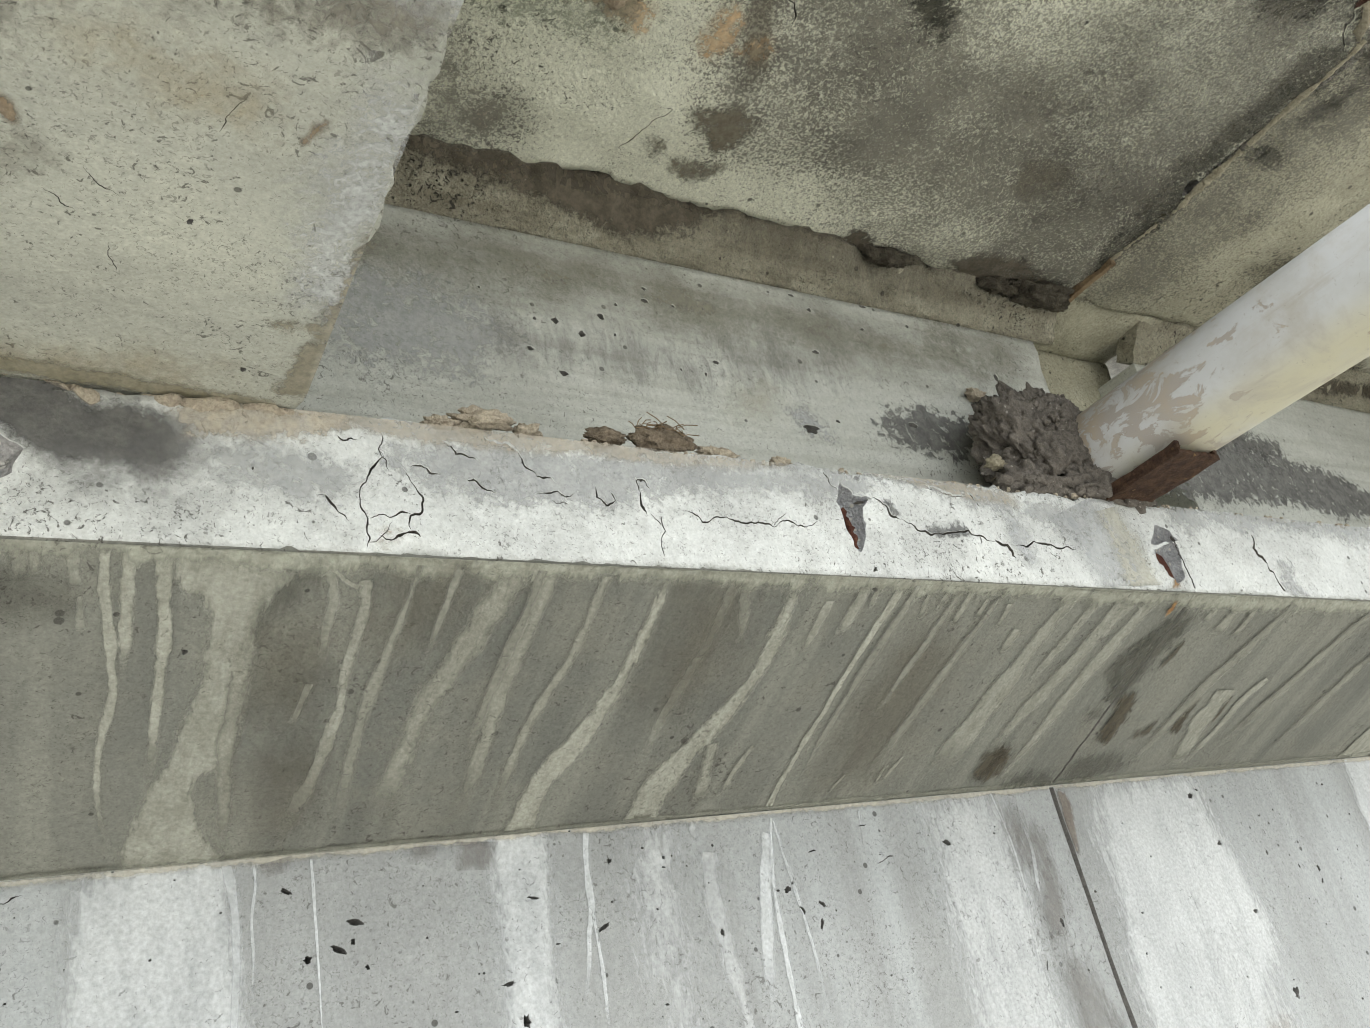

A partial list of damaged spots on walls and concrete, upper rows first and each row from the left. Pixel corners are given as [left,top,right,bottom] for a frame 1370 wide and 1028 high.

peeling [1352,0,1370,42]
leakage [648,0,1370,322]
leakage [0,0,551,476]
leakage [468,246,741,323]
spalling [0,434,24,478]
leakage [870,405,974,465]
crack [319,436,820,556]
spalling [836,481,870,552]
crack [823,472,1076,558]
spalling [1151,525,1185,583]
crack [1251,535,1285,591]
leakage [0,433,1370,1028]